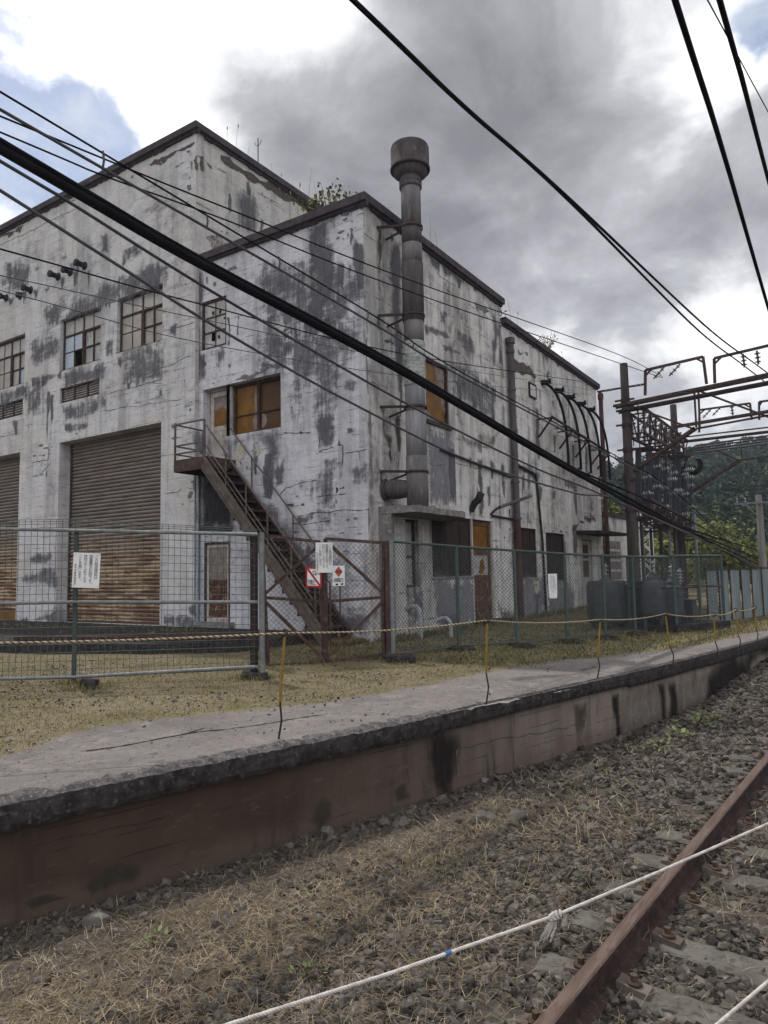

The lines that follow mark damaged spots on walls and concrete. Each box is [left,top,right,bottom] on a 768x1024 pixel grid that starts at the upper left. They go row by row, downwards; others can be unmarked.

peeling [150,142,310,212]
damp [1,363,105,456]
damp [118,345,163,388]
damp [257,212,369,446]
damp [378,244,403,416]
crack [86,713,328,751]
damp [432,737,458,792]
damp [613,648,768,736]